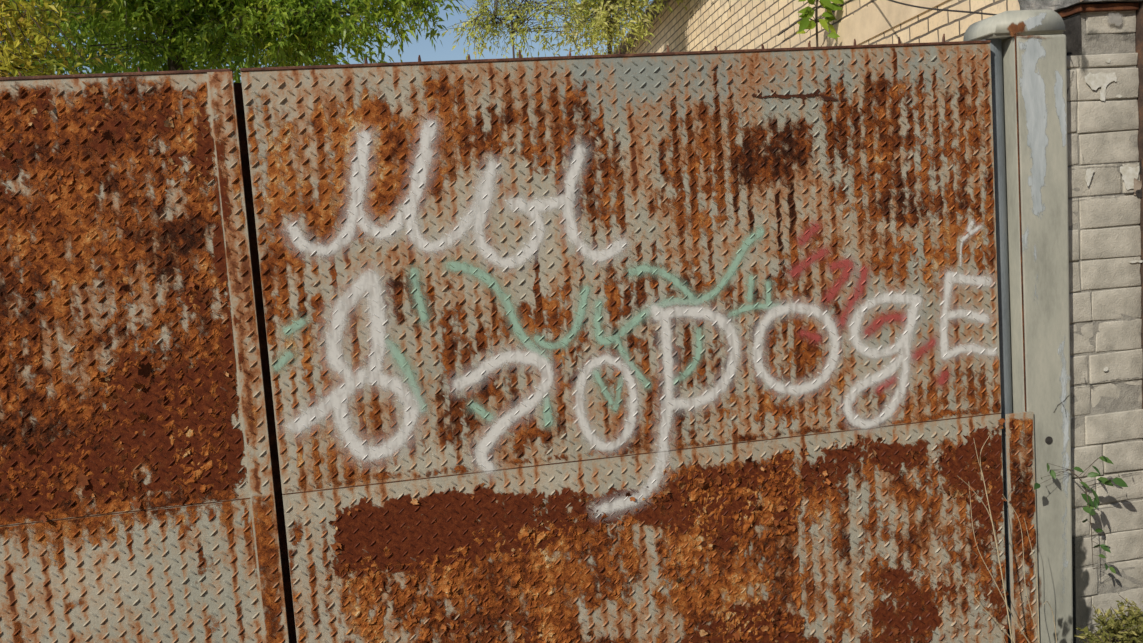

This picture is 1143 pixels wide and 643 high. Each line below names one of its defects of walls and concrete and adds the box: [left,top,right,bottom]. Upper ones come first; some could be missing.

rust [0,68,643,643]
rust [281,48,1001,498]
rust [642,419,1036,643]
peeling [1019,12,1066,217]